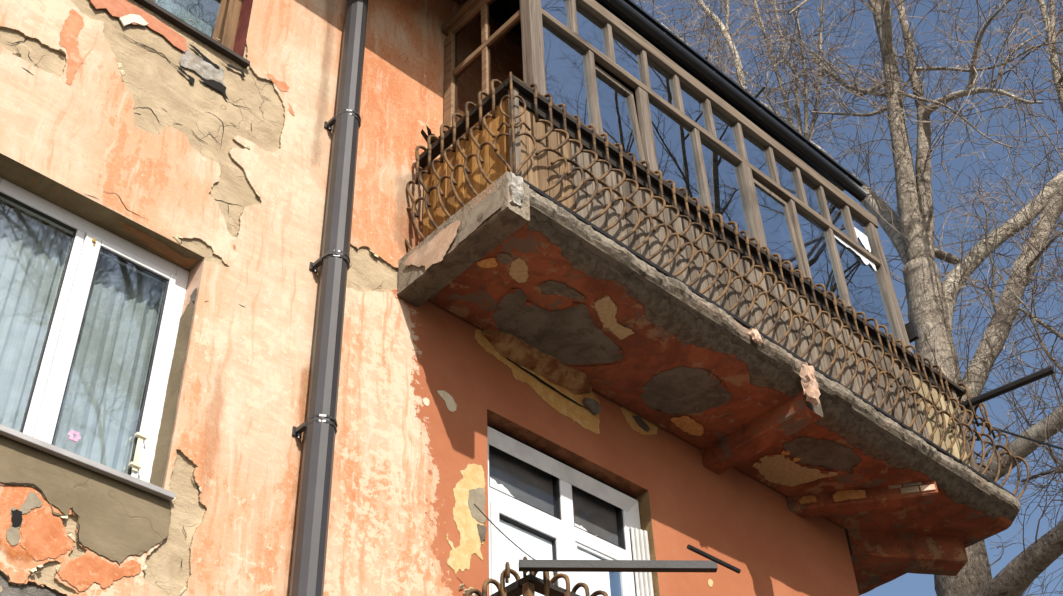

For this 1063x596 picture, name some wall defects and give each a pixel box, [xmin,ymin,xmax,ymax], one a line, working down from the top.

flaking render [0,0,295,237]
flaking render [173,236,229,268]
flaking render [346,171,524,292]
flaking render [475,253,634,434]
spalling [748,328,762,345]
peeling [423,390,457,412]
flaking render [620,366,732,436]
spalling [799,362,820,406]
flaking render [0,449,207,596]
peeling [446,464,487,596]
flaking render [753,437,861,504]
peeling [833,490,866,502]